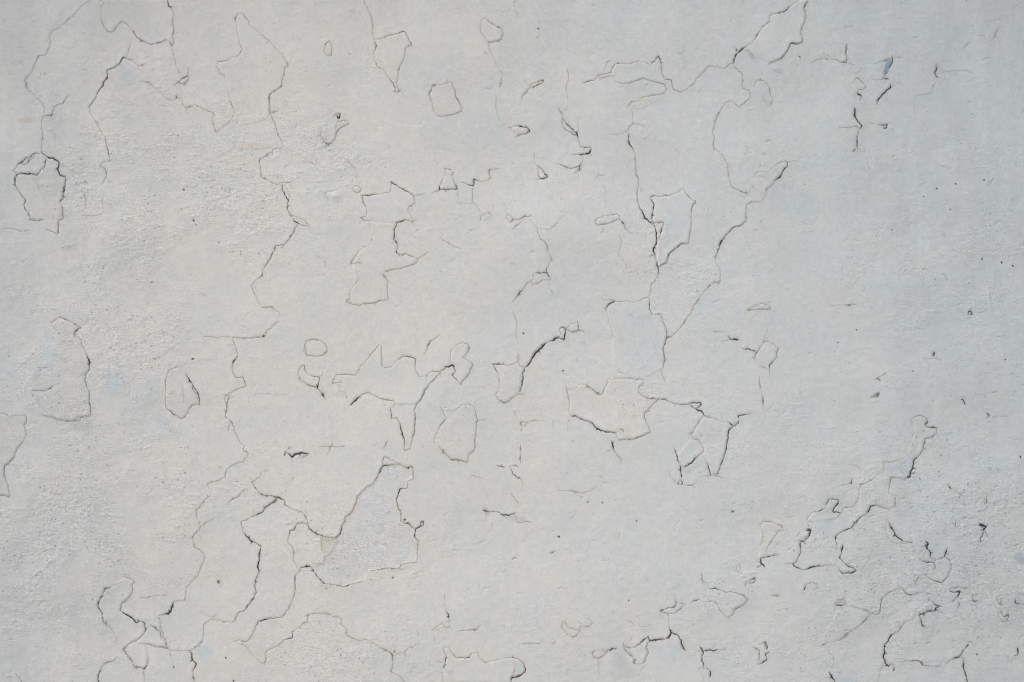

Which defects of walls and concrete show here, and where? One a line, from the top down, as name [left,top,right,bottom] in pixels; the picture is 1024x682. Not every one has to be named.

peeling [584,0,808,135]
crack [852,84,891,170]
peeling [12,152,66,234]
peeling [650,188,696,267]
crack [628,66,764,426]
peeling [29,312,97,435]
peeling [165,362,200,419]
peeling [298,339,327,398]
peeling [660,415,937,627]
peeling [885,522,978,614]
peeling [96,576,171,682]
peeling [437,647,526,682]